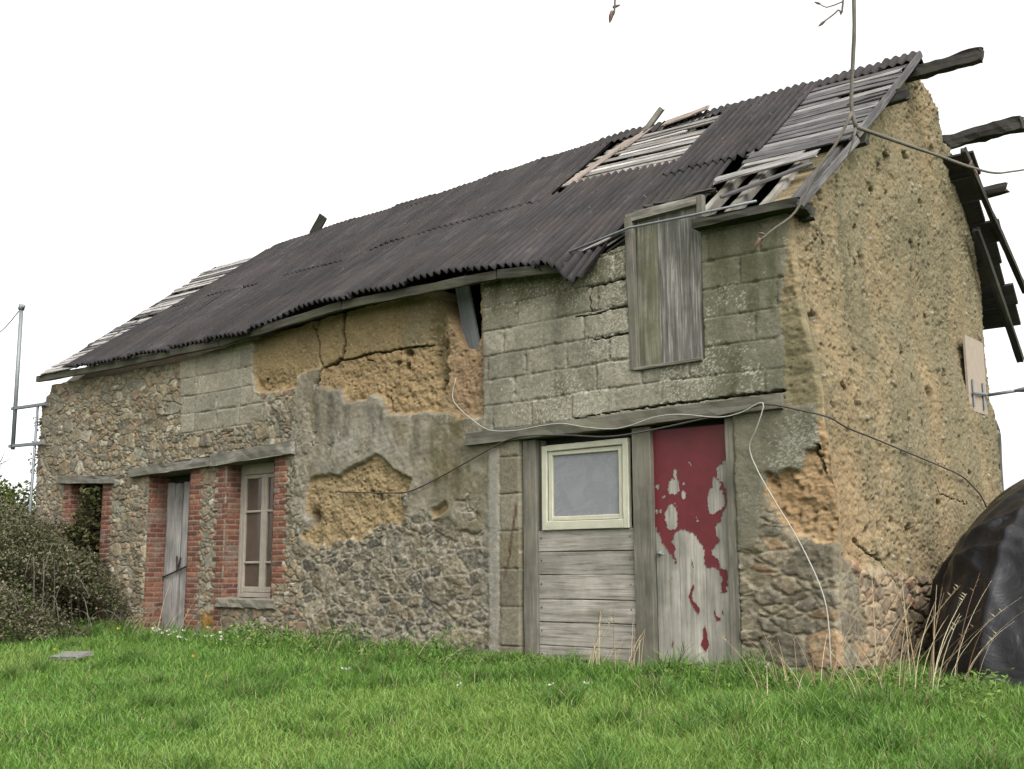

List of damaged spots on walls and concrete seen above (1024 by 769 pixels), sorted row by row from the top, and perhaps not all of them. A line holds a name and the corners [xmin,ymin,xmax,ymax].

crack [316,314,436,384]
flaking render [301,454,412,547]
peeling [653,424,728,593]
spalling [764,420,840,544]
peeling [701,627,709,652]